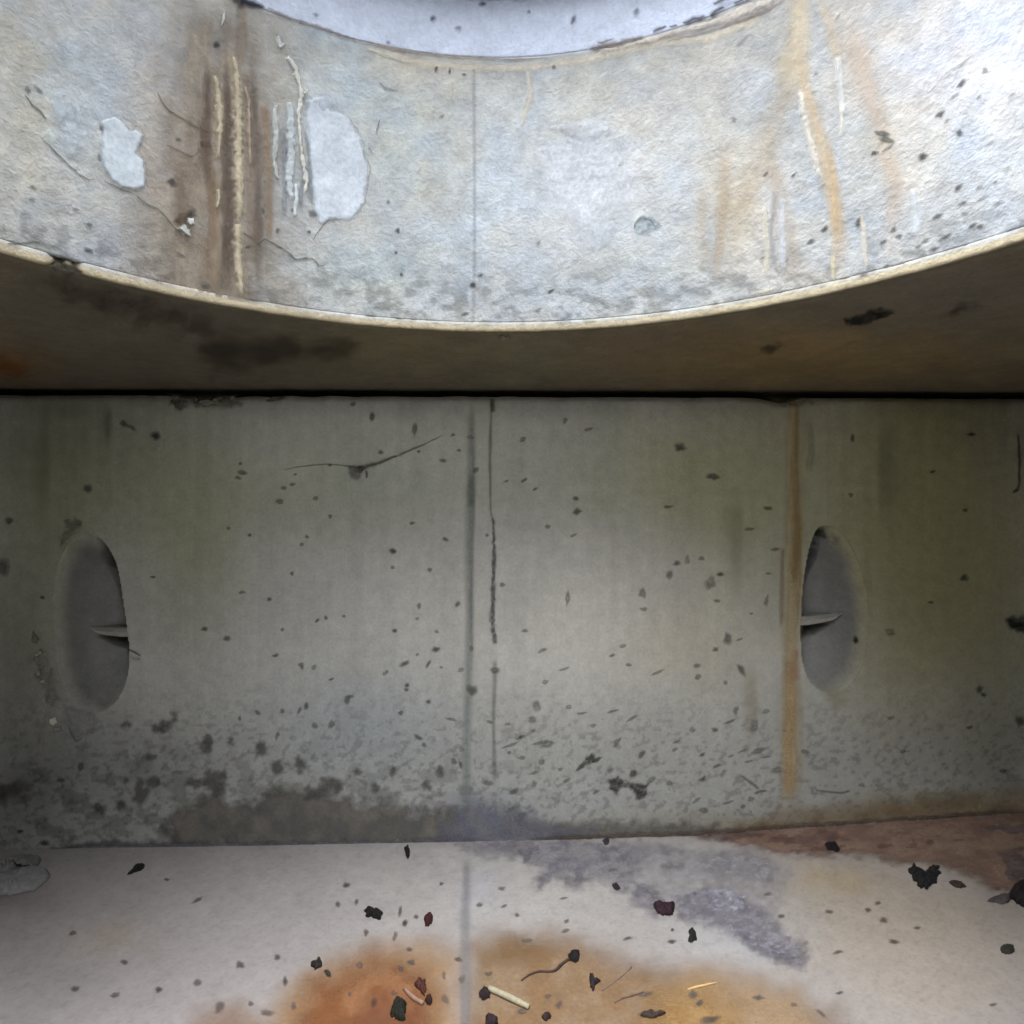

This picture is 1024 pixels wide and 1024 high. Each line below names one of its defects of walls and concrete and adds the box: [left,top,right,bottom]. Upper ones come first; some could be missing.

peeling [102,117,144,189]
corrosion [172,6,271,299]
peeling [307,96,369,223]
crack [289,436,440,479]
water stain [159,449,713,845]
water stain [153,714,176,733]
water stain [95,778,160,814]
corrosion [281,953,447,1024]